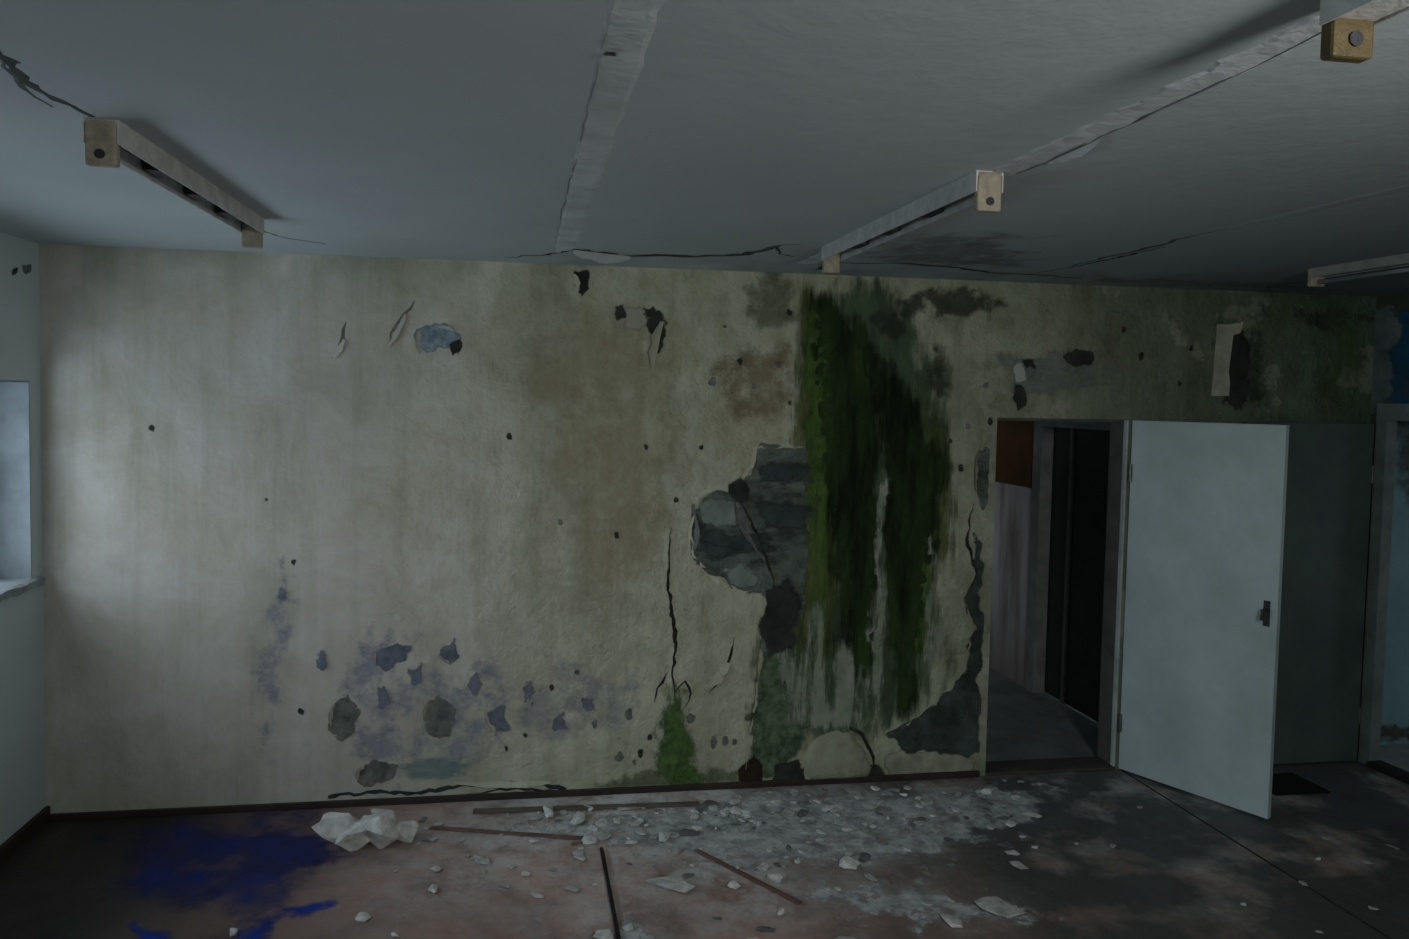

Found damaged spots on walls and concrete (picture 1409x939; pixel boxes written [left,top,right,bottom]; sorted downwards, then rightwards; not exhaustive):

crack [0,51,96,117]
crack [505,32,801,264]
crack [1016,32,1321,174]
peeling [387,302,462,355]
water stain [747,280,1003,716]
peeling [328,696,360,741]
peeling [372,643,412,671]
peeling [423,695,456,738]
peeling [328,760,566,799]
crack [654,528,692,709]
flaking render [674,443,815,782]
flaking render [868,447,990,776]